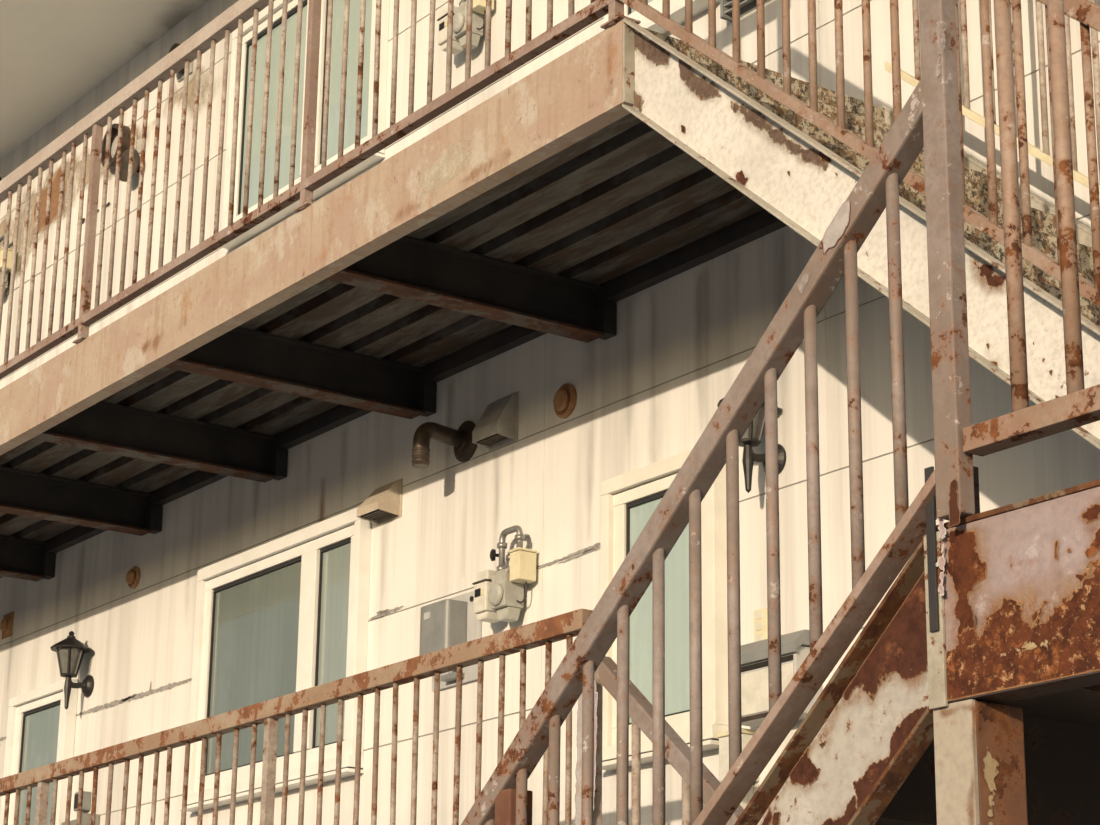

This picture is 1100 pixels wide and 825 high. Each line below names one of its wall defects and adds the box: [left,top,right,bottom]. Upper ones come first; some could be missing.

corrosion [761,807,780,825]
corrosion [789,571,928,787]
corrosion [822,706,927,825]
corrosion [943,476,1100,724]